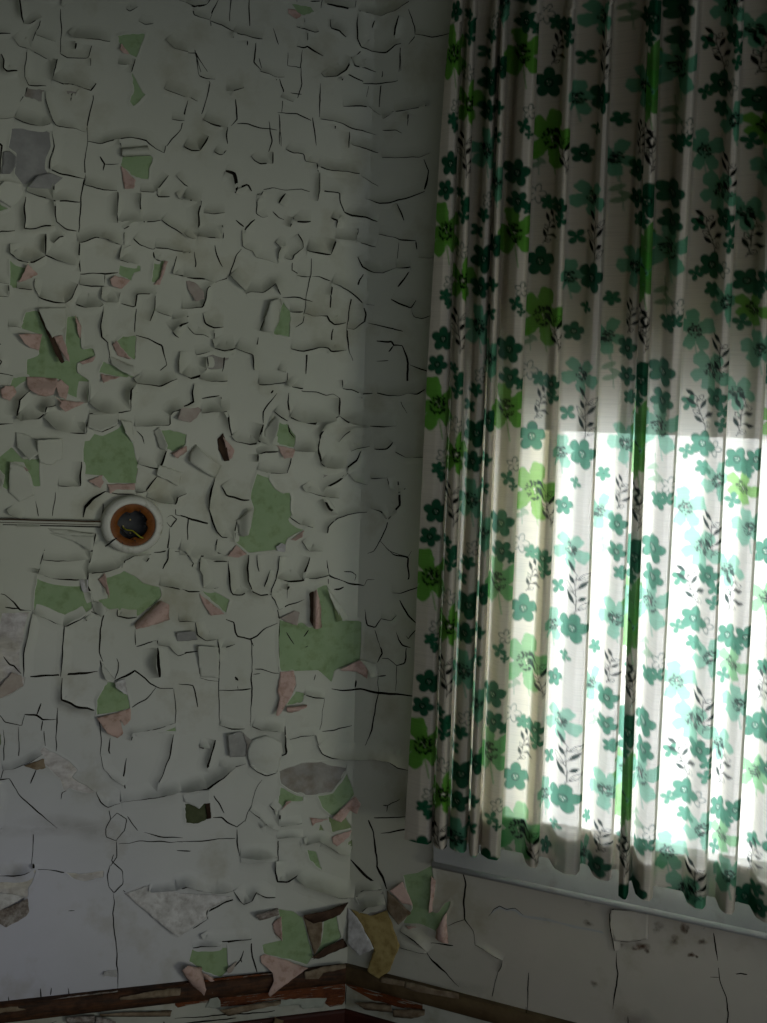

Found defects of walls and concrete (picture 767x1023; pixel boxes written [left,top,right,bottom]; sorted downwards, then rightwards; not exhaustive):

peeling [0,307,141,502]
peeling [217,434,234,461]
peeling [228,469,307,558]
peeling [0,569,170,701]
peeling [94,662,134,738]
peeling [274,582,378,717]
peeling [228,731,361,855]
peeling [0,867,40,927]
crack [163,1010,275,1023]
peeling [66,862,454,1023]
crack [604,906,642,1023]
crack [713,933,747,1023]